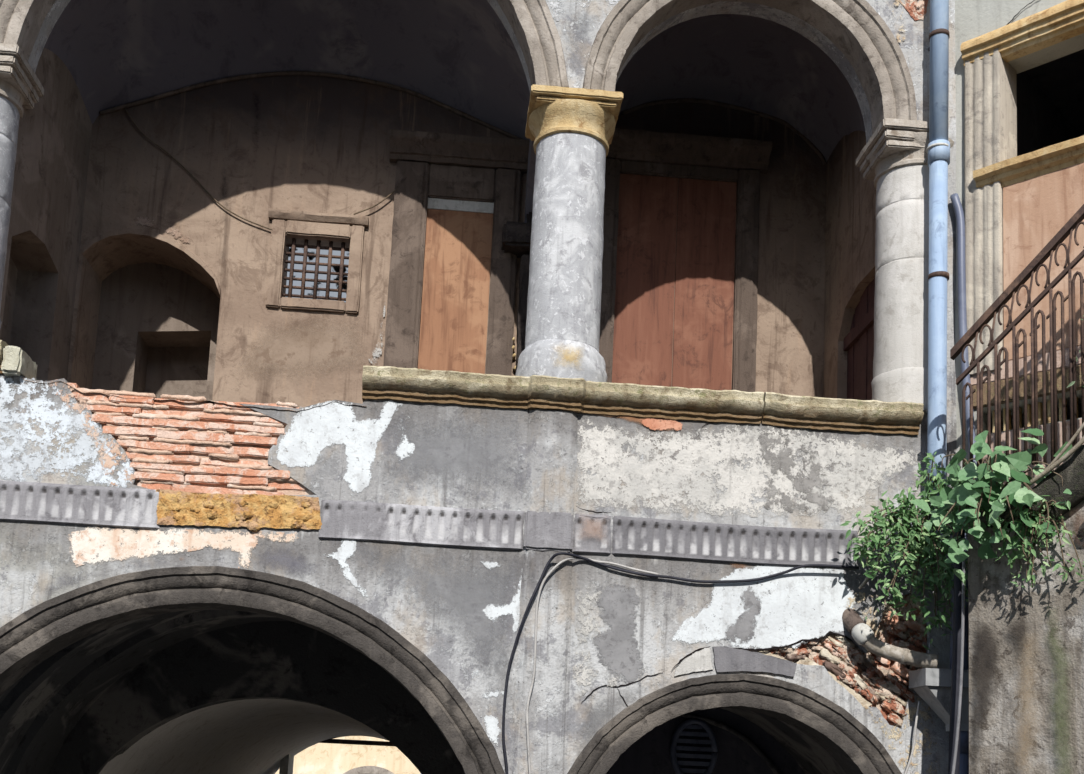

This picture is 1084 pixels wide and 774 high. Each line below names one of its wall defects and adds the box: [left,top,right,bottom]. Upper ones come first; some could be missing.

spalling [893,0,928,42]
flaking render [0,376,415,496]
peeling [69,526,297,568]
peeling [327,540,367,597]
crack [582,631,852,707]
peeling [668,565,937,774]